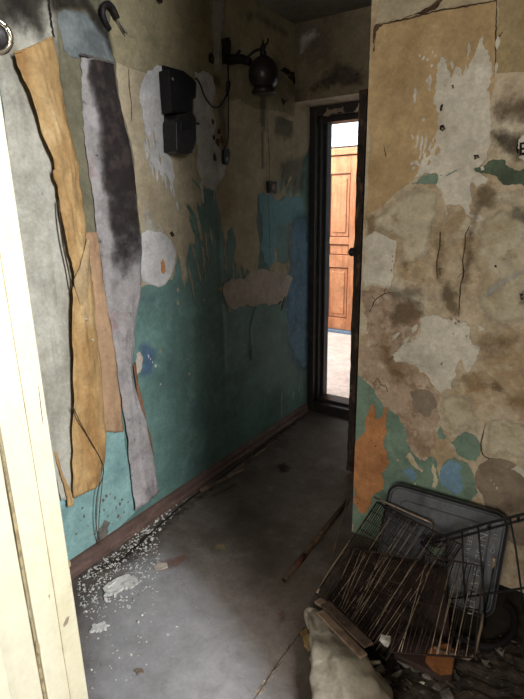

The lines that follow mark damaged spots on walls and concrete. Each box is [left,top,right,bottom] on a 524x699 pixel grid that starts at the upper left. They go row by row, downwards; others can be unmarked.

peeling [412,174,438,184]
peeling [474,155,524,186]
crack [435,232,443,278]
crack [458,226,470,316]
flaking render [352,286,524,546]